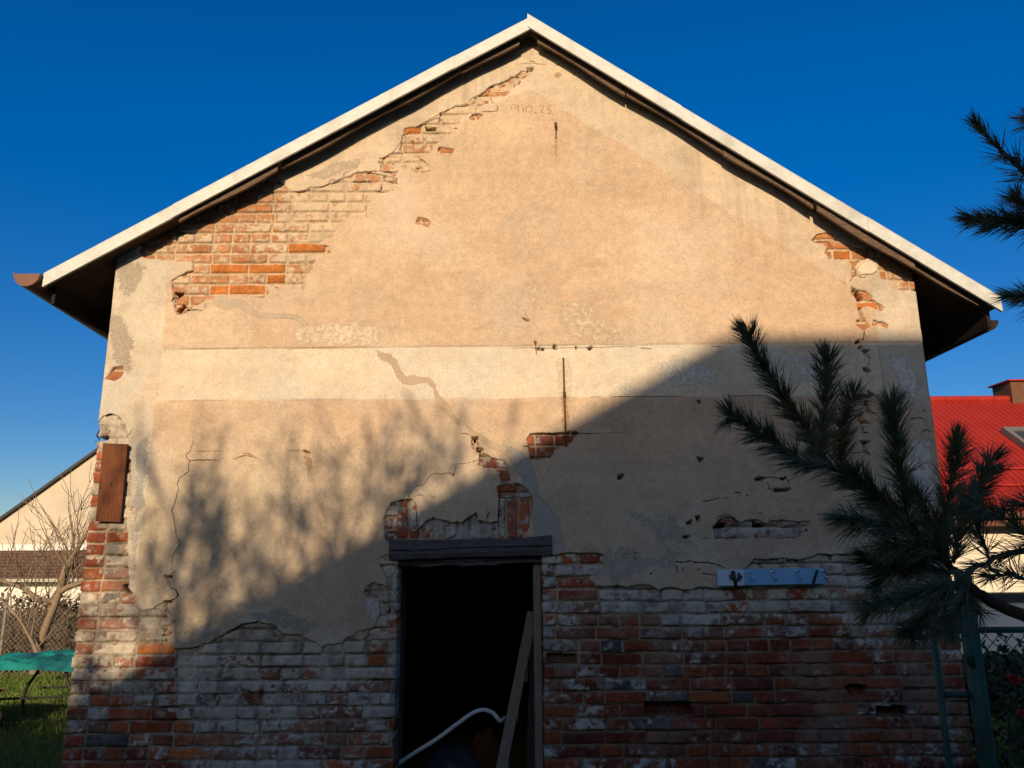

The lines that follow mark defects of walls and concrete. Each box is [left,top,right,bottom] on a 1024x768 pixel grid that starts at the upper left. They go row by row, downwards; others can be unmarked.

flaking render [106,367,124,381]
crack [154,444,257,641]
flaking render [61,414,533,768]
flaking render [139,72,529,315]
crack [377,351,618,536]
flaking render [527,431,578,460]
flaking render [540,553,976,768]
flaking render [713,517,809,541]
flaking render [812,233,915,292]
flaking render [850,291,888,331]